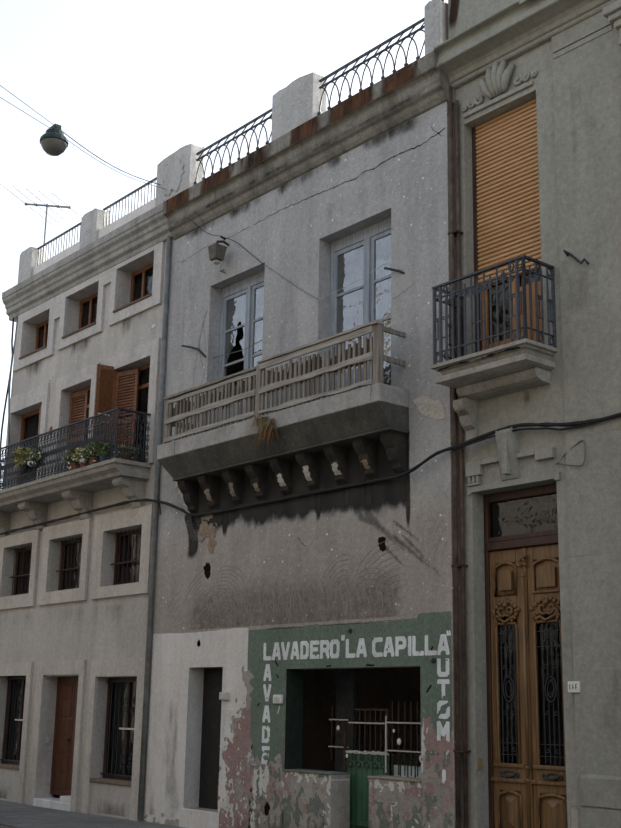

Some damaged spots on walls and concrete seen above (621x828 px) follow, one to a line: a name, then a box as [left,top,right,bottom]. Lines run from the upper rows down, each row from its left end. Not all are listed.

rust [383,60,417,94]
rust [329,85,372,124]
rust [290,116,318,145]
rust [201,142,270,194]
rust [166,188,189,213]
crack [174,125,445,278]
spalling [197,514,217,554]
peeling [217,700,331,828]
peeling [369,709,454,828]